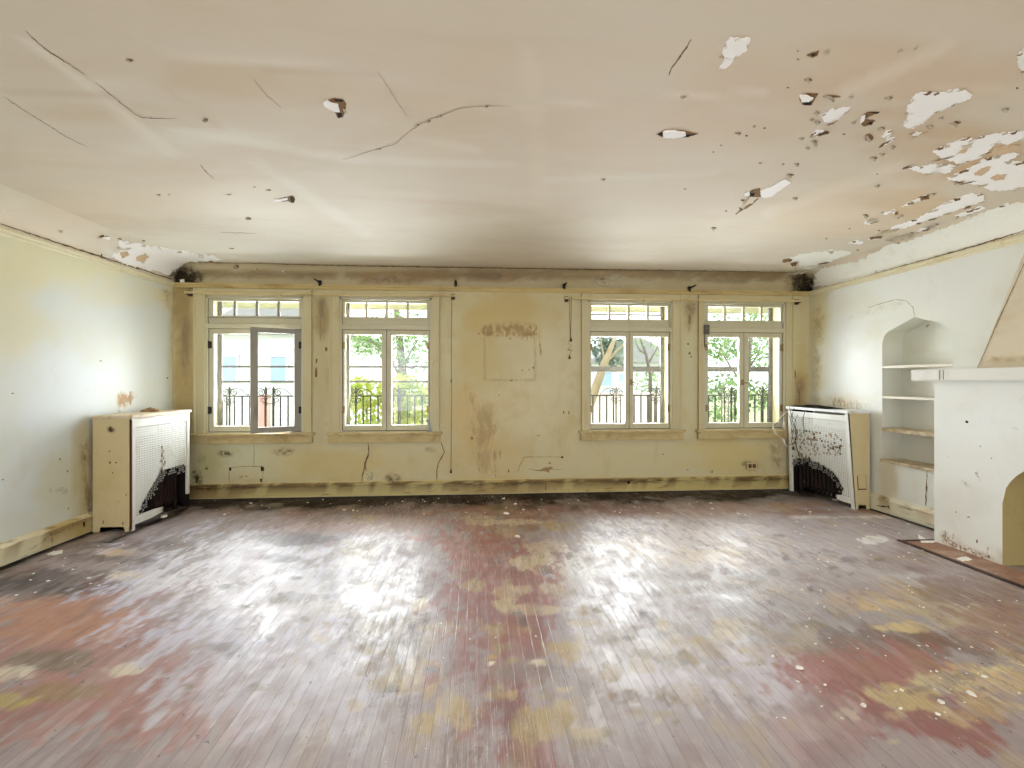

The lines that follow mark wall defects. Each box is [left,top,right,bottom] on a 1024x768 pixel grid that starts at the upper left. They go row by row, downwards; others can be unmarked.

crack [27,32,171,119]
peeling [719,37,751,69]
flaking render [323,98,347,118]
crack [343,73,510,160]
flaking render [657,130,697,139]
flaking render [742,163,799,209]
peeling [782,78,1024,291]
peeling [96,235,234,289]